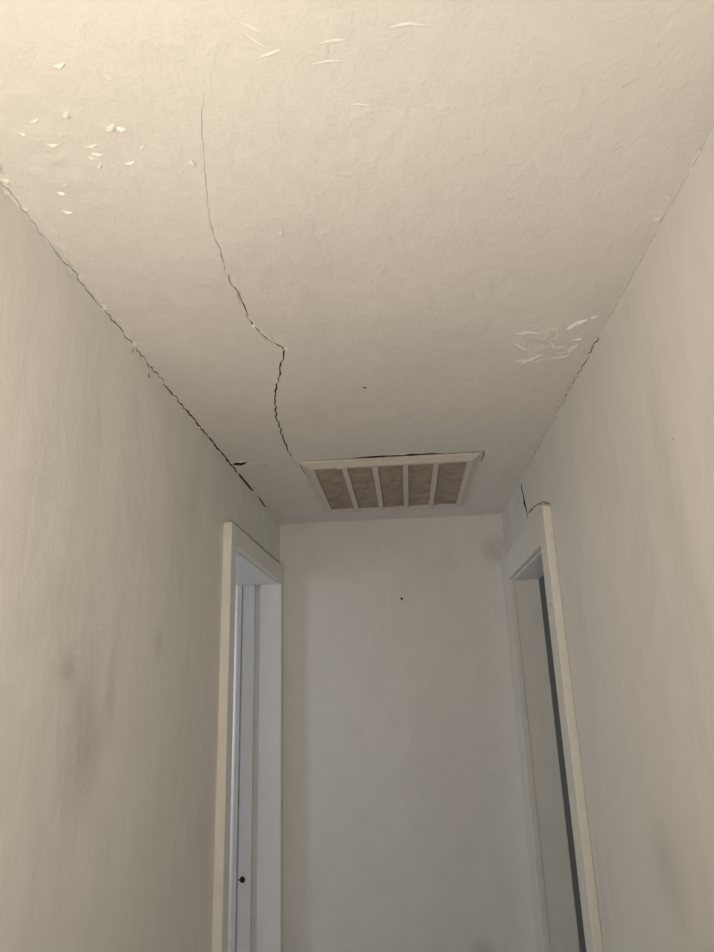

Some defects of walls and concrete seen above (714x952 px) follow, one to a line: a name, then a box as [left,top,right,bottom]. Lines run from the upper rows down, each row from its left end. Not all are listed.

crack [0,172,267,517]
crack [201,94,298,468]
crack [229,518,279,563]